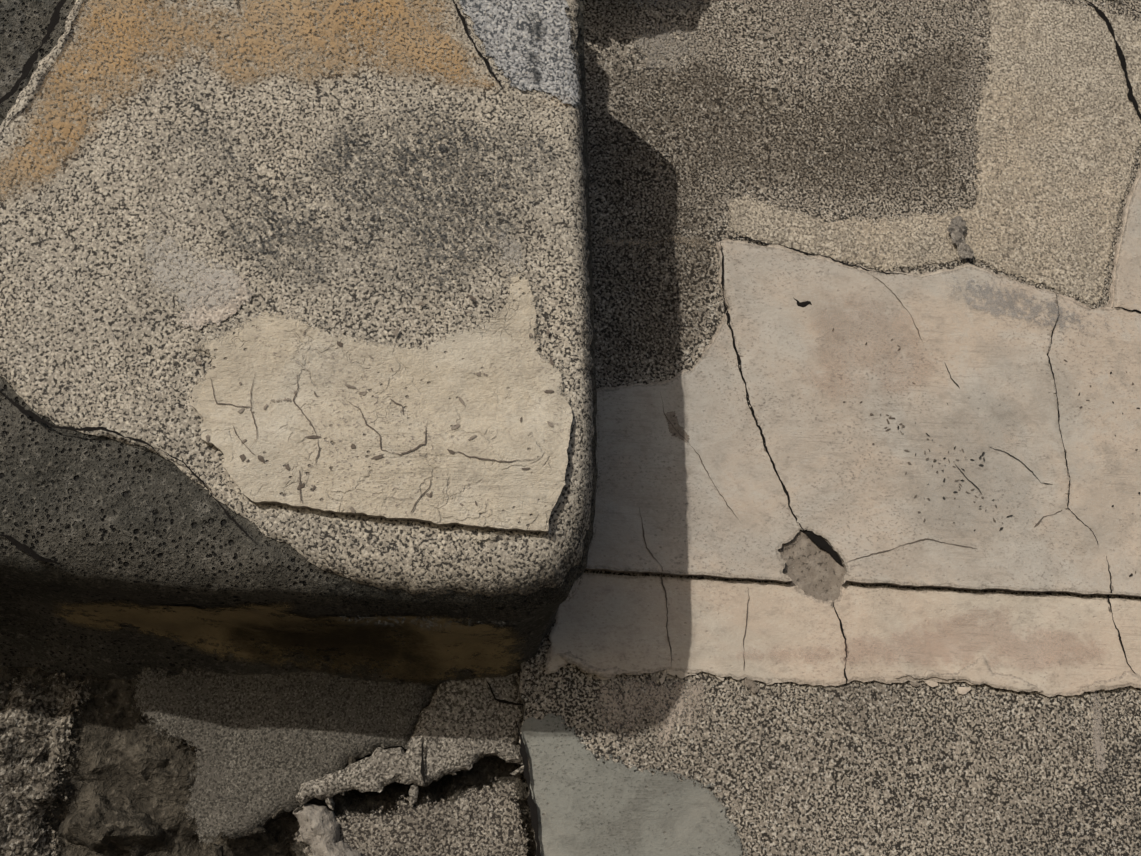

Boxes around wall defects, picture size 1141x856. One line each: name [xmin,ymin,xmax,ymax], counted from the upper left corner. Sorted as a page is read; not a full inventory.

crack [1085,0,1141,120]
leakage [576,103,598,401]
crack [719,237,923,531]
crack [990,292,1141,675]
spalling [778,530,845,601]
crack [846,538,972,563]
leakage [132,416,598,845]
crack [742,594,750,665]
crack [830,602,849,684]
peeling [899,655,1043,695]
peeling [1076,671,1141,696]
spalling [398,780,419,807]